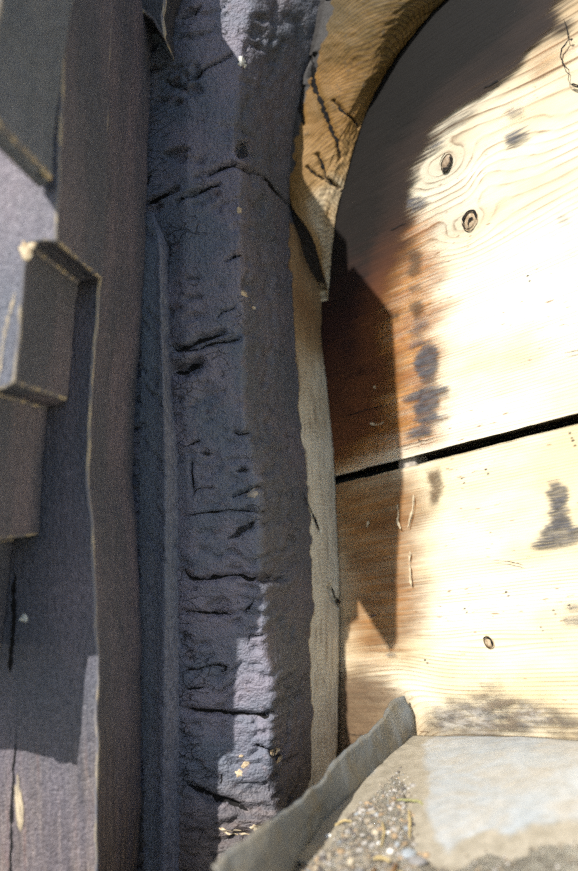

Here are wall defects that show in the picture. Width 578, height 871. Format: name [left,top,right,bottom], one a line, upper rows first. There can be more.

crack [560,19,578,88]
crack [298,58,358,189]
leakage [403,323,448,439]
crack [8,572,17,673]
leakage [335,473,426,656]
leakage [427,471,441,501]
leakage [532,479,578,548]
crack [8,730,16,871]